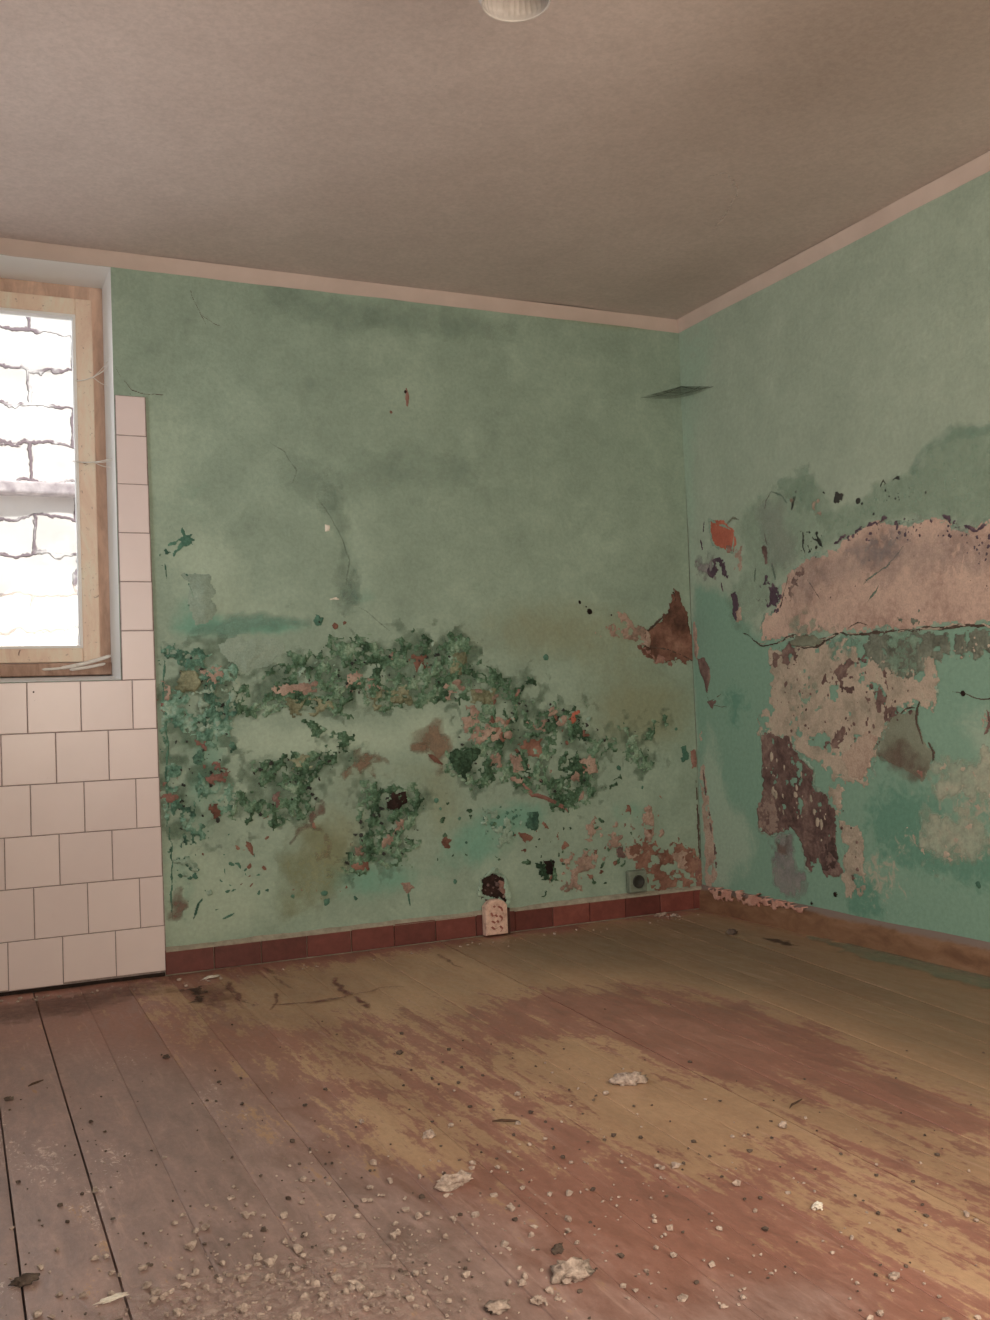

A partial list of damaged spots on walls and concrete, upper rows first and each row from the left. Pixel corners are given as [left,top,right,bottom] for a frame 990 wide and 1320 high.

peeling [708,517,739,554]
flaking render [595,588,725,709]
peeling [731,592,742,622]
crack [743,622,990,648]
peeling [754,514,990,899]
peeling [172,834,266,919]
peeling [434,764,813,913]